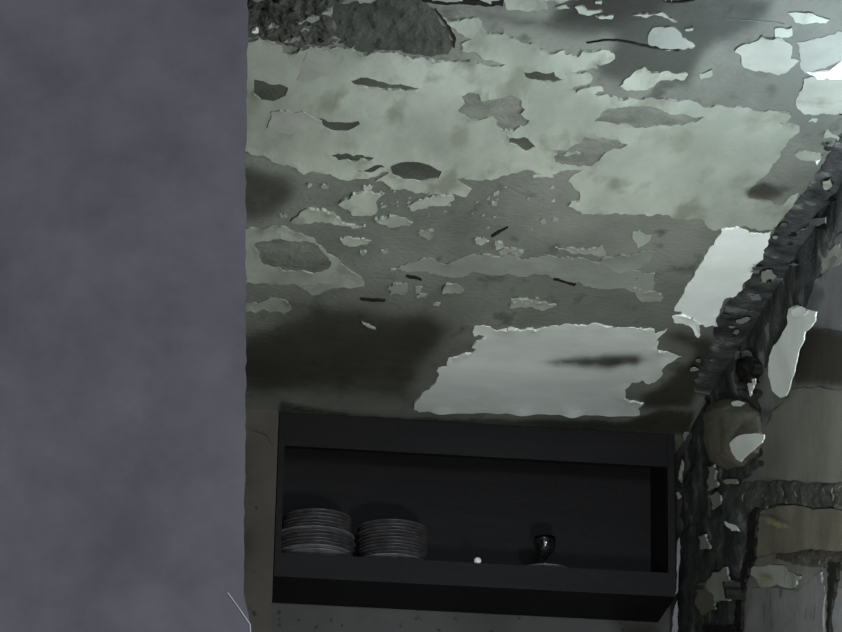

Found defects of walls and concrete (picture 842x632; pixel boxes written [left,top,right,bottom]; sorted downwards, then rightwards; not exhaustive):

peeling [245,0,842,632]
damp [563,357,639,367]